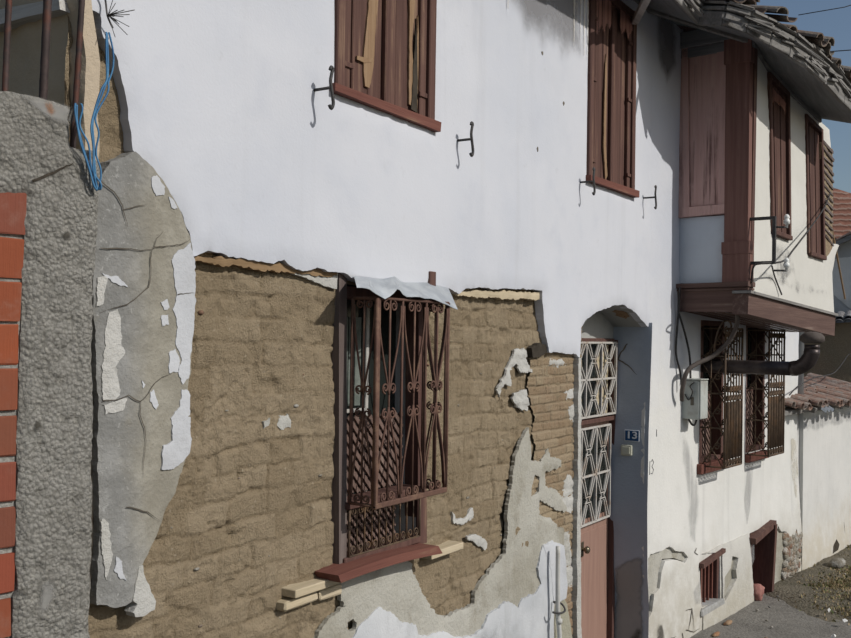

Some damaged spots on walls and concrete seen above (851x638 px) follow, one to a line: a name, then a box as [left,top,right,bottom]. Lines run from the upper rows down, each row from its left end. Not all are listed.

damp [521,0,589,54]
crack [101,180,143,227]
crack [100,232,189,312]
spalling [88,44,583,638]
crack [87,469,95,583]
spalling [648,547,685,599]